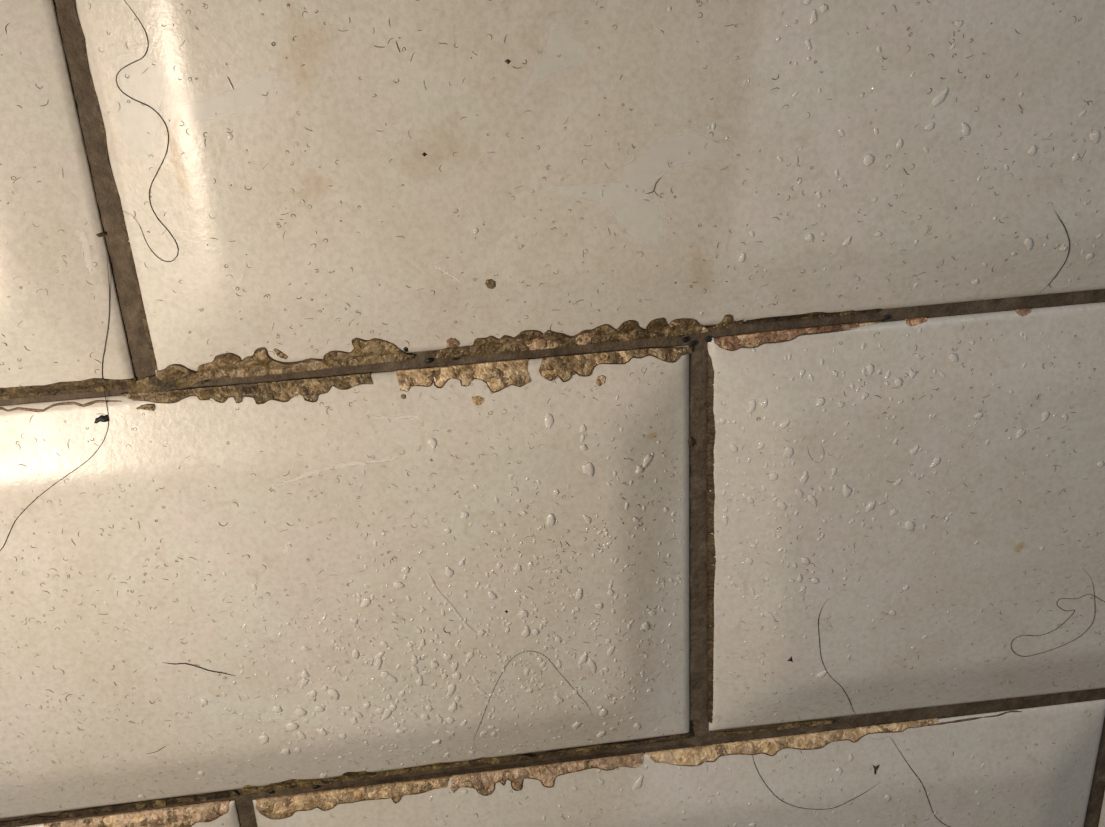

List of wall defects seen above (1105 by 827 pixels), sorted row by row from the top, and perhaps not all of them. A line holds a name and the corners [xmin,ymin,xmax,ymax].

peeling [905,317,927,326]
spalling [120,314,881,411]
crack [0,400,122,412]
spalling [256,718,938,820]
spalling [44,800,229,827]